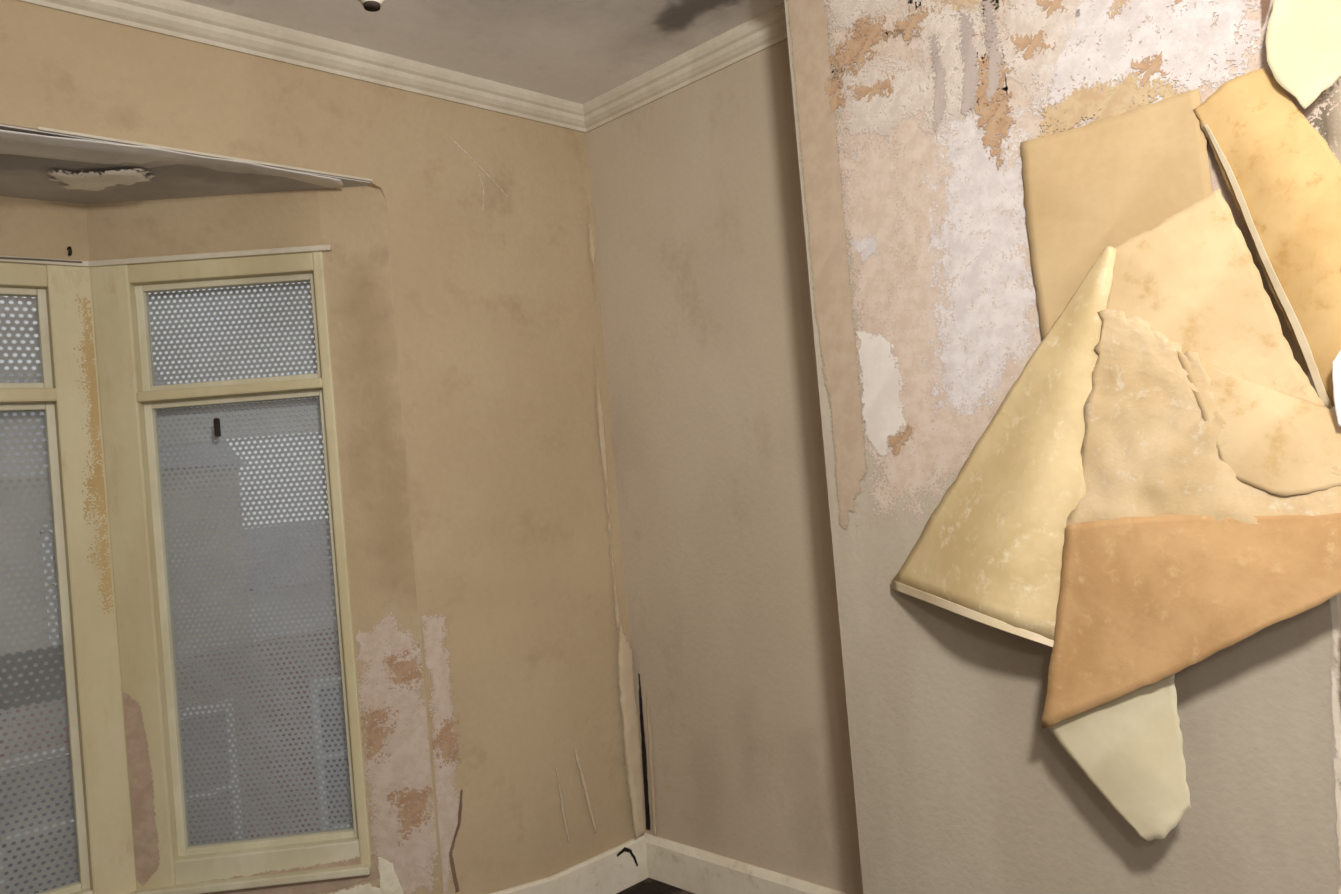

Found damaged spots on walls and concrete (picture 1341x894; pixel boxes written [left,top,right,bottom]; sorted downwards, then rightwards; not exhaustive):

peeling [824,0,1341,543]
peeling [123,693,160,885]
peeling [183,610,439,894]